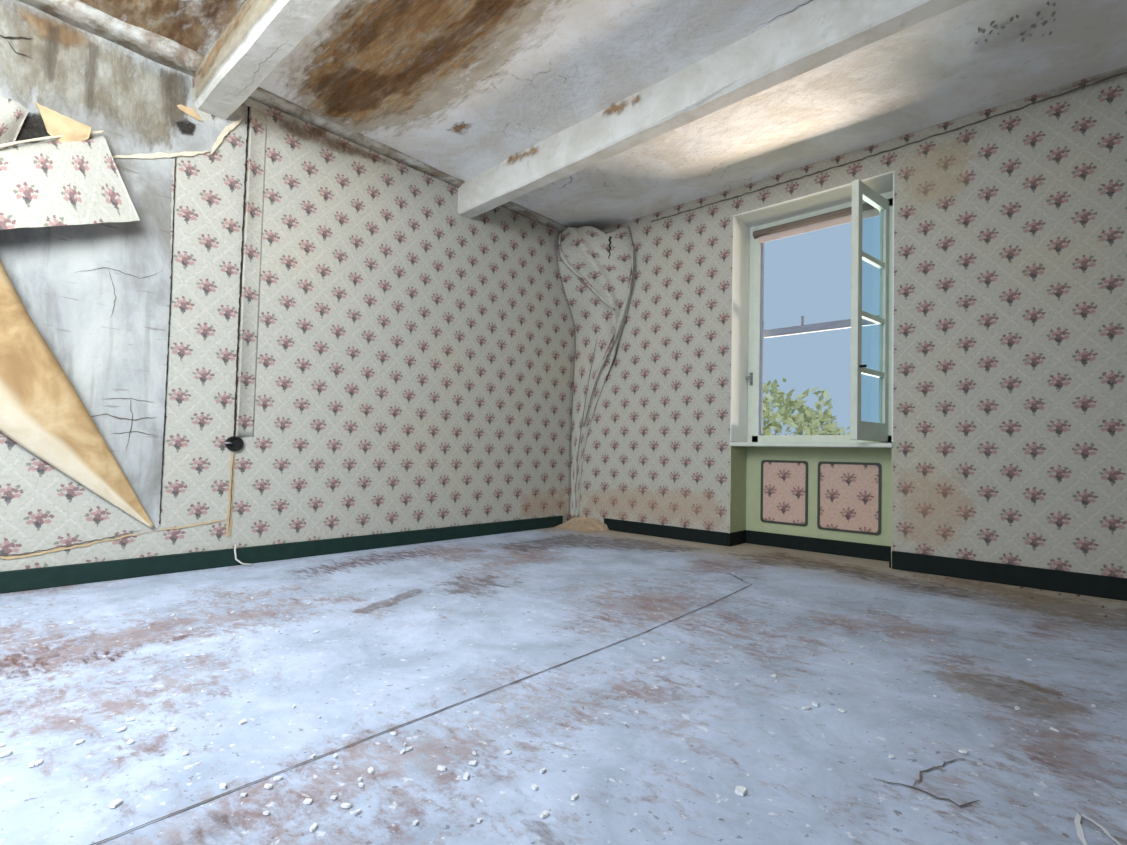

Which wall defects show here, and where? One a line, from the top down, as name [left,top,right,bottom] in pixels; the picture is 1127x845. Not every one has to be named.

damp [0,0,274,145]
damp [283,0,560,162]
flaking render [0,0,241,530]